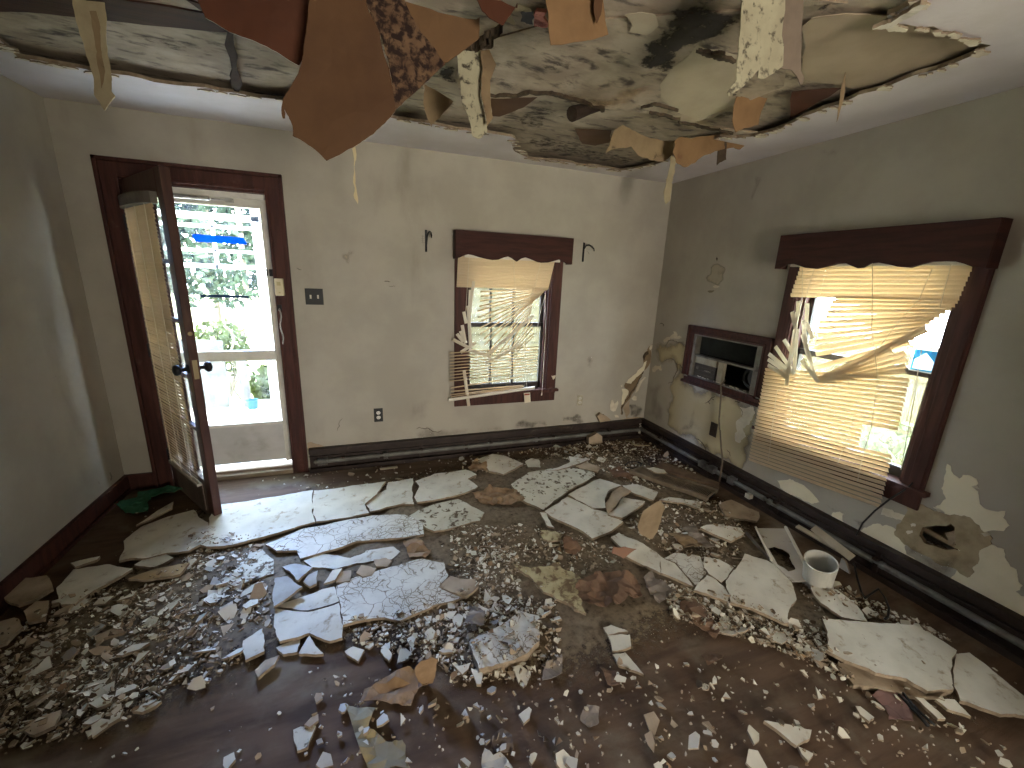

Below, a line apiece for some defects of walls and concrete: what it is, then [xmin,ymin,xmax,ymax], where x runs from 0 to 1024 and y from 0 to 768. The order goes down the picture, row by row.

damp [641,7,737,72]
spalling [872,0,927,30]
damp [438,67,455,82]
spalling [610,331,681,420]
peeling [735,406,755,443]
peeling [861,464,1024,616]